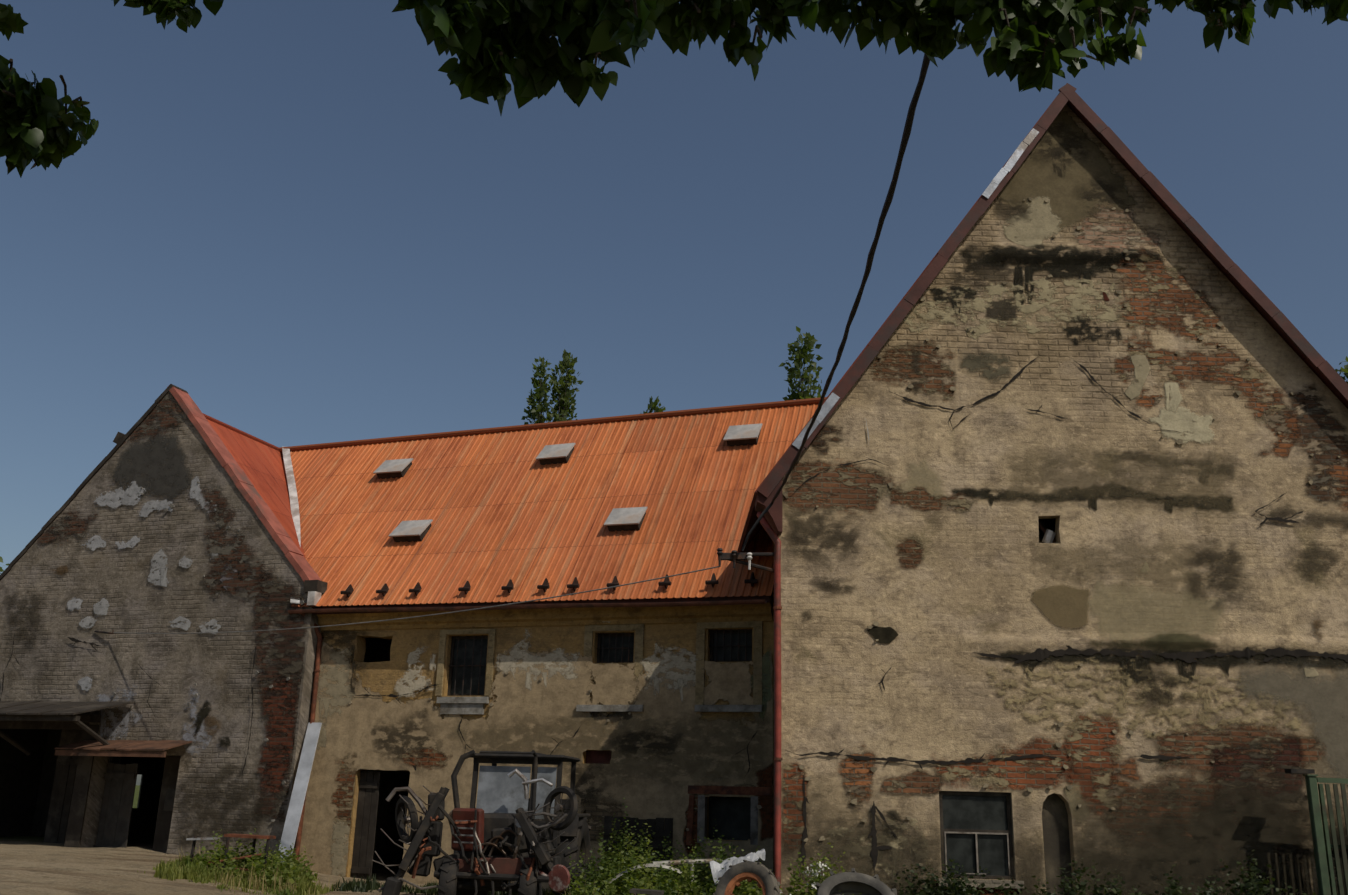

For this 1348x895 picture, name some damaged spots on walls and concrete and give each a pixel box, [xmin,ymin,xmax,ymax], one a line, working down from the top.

flaking render [871,197,1348,510]
crack [889,355,1182,433]
flaking render [38,481,175,551]
flaking render [897,536,924,568]
peeling [67,598,110,629]
flaking render [148,476,307,822]
spalling [867,622,898,644]
peeling [78,677,141,740]
peeling [298,630,1324,884]
crack [1135,753,1191,761]